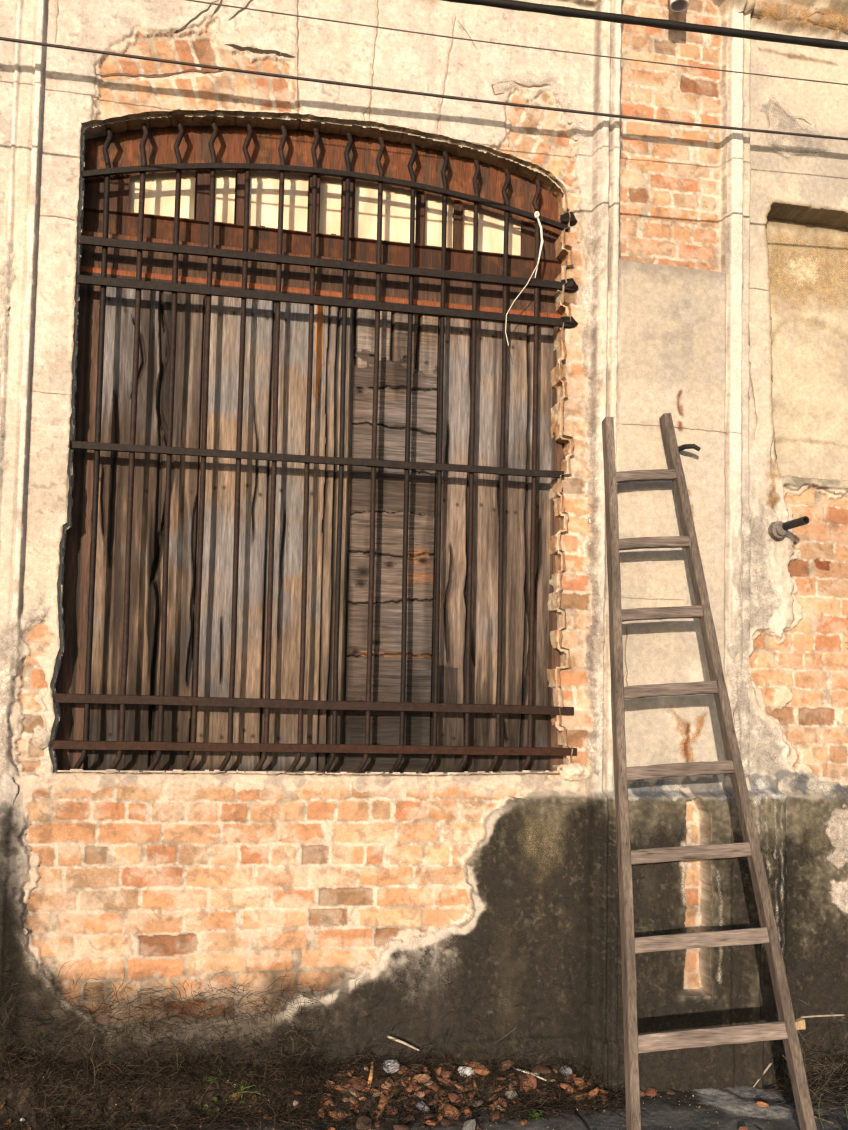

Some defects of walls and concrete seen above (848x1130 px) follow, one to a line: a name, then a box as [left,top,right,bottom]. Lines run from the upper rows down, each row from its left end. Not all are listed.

crack [96,0,299,112]
flaking render [93,19,302,128]
crack [363,0,379,121]
crack [491,80,550,95]
flaking render [620,0,722,272]
flaking render [485,76,606,781]
corrosion [680,717,704,762]
flaking render [0,598,533,1034]
water stain [0,798,685,1094]
water stain [635,944,778,1034]
water stain [763,830,848,1064]
water stain [638,1039,789,1093]